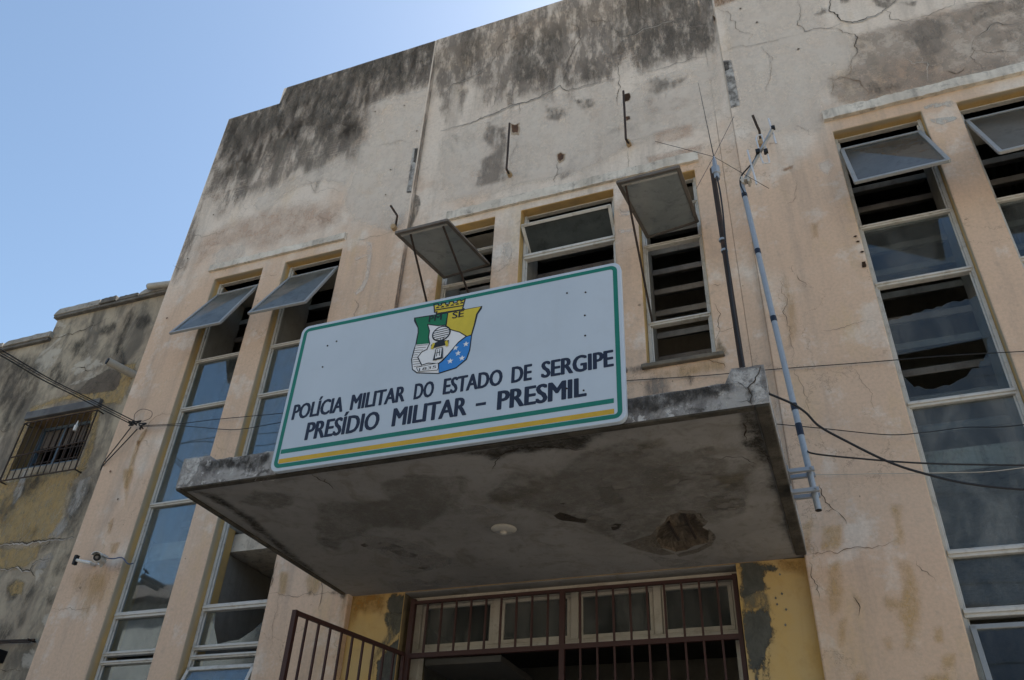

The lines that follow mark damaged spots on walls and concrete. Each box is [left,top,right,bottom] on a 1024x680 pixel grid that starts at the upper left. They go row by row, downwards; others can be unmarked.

crack [440,0,1024,131]
leakage [205,0,712,228]
leakage [176,219,195,274]
leakage [395,252,406,308]
leakage [101,316,149,335]
leakage [0,360,38,425]
crack [707,284,770,465]
crack [0,536,73,574]
spalling [623,510,715,557]